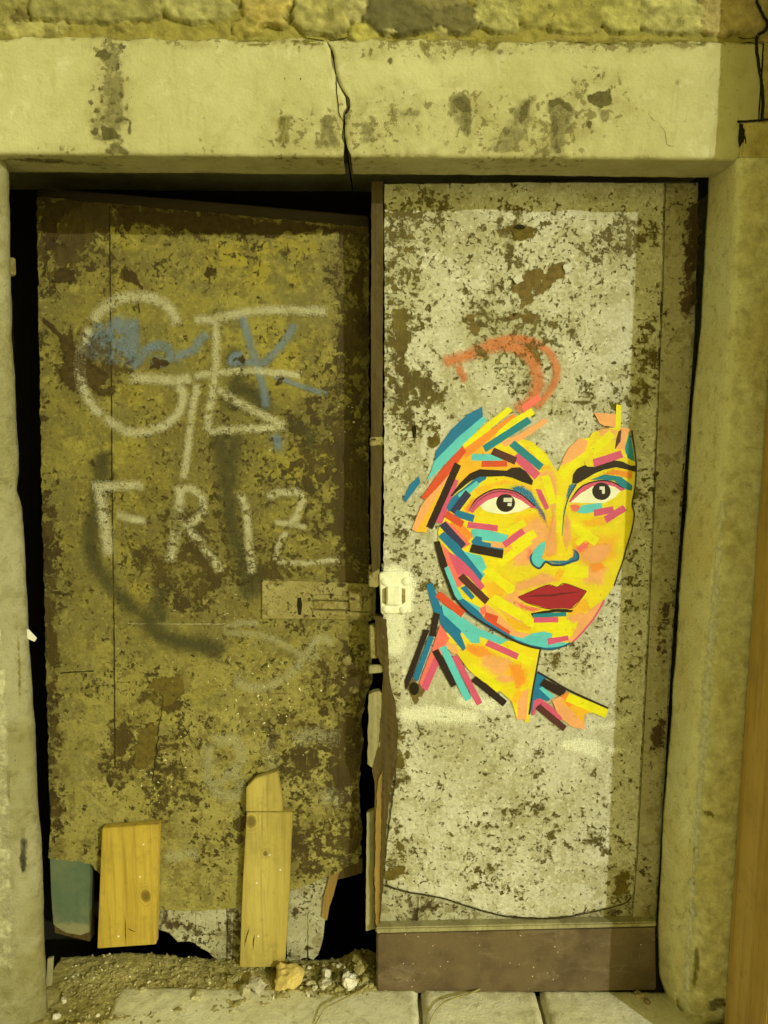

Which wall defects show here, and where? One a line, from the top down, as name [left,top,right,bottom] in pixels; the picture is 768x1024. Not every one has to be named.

spalling [88,39,132,140]
crack [304,37,350,157]
spalling [576,74,612,128]
crack [737,0,768,123]